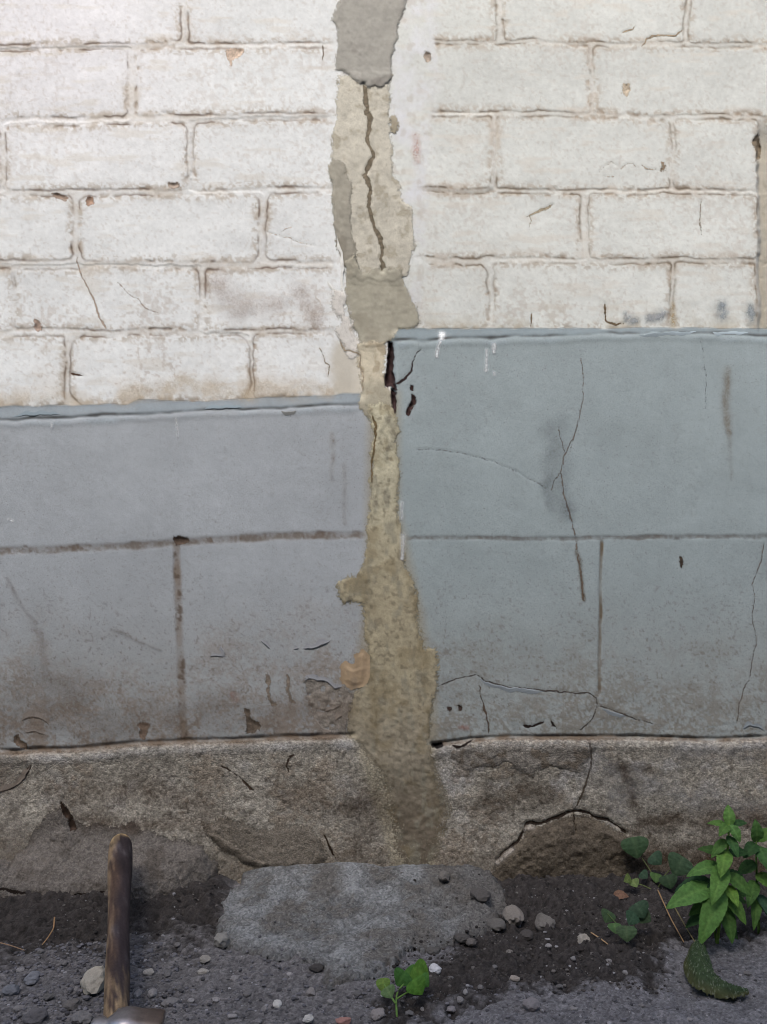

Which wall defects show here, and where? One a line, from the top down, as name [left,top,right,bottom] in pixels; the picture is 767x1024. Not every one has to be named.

crack [362,85,386,270]
crack [76,257,106,328]
flaking render [315,239,360,359]
crack [395,350,420,385]
spalling [406,385,417,416]
crack [417,360,584,601]
crack [737,545,764,721]
crack [221,766,254,790]
crack [438,674,653,860]